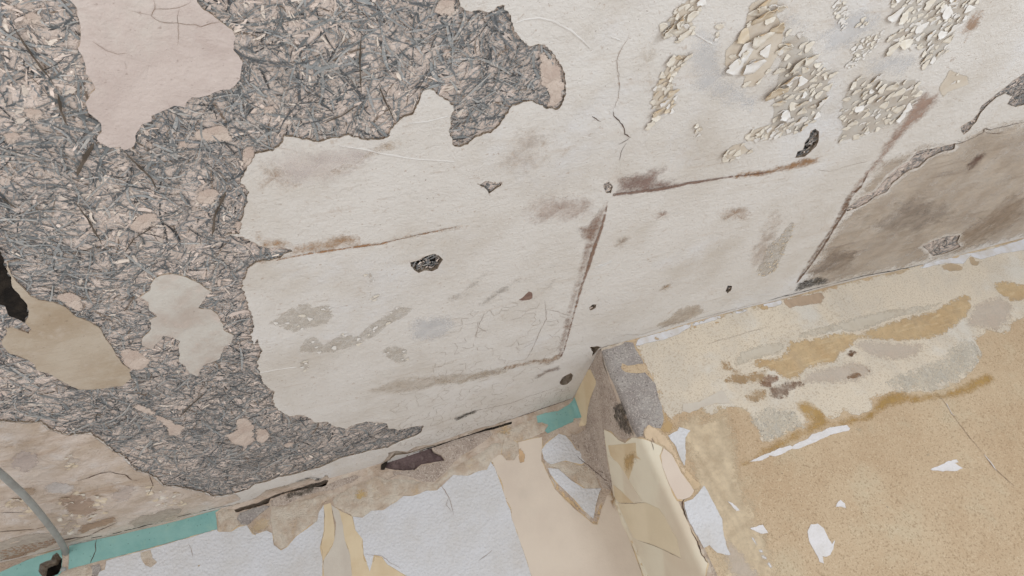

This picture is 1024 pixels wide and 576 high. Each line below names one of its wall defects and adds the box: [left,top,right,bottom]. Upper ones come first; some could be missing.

crack [592,37,629,157]
peeling [645,0,707,131]
corrosion [736,159,815,179]
peeling [722,0,979,163]
water stain [796,93,1024,291]
spalling [846,73,1024,210]
spalling [0,0,566,561]
peeling [549,342,701,490]
water stain [800,403,826,430]
water stain [848,393,918,422]
water stain [947,376,992,396]